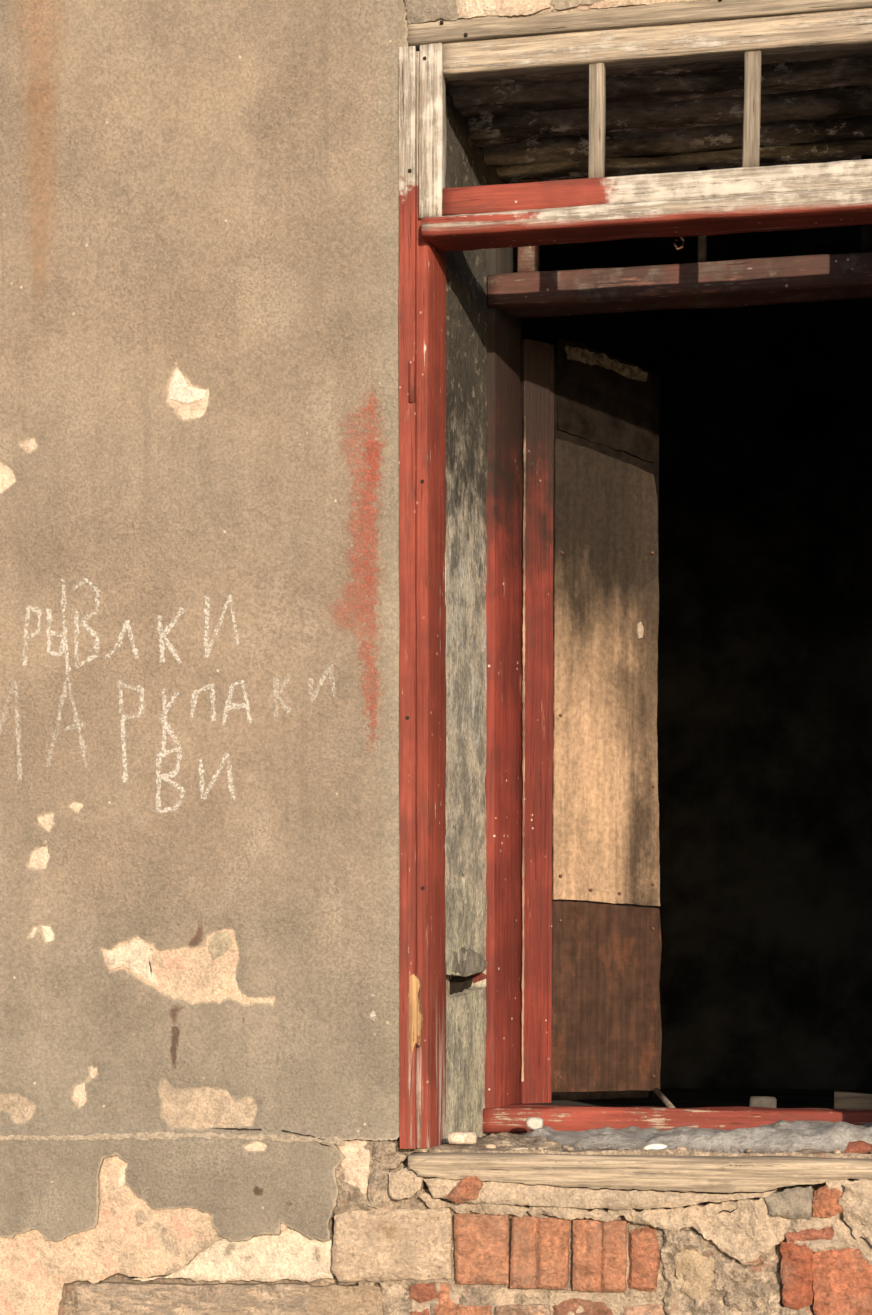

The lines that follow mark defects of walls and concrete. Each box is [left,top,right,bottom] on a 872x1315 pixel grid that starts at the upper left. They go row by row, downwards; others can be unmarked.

spalling [405,0,700,24]
flaking render [167,365,209,419]
flaking render [0,462,15,493]
peeling [102,929,275,1005]
flaking render [0,1095,35,1123]
flaking render [73,1068,97,1108]
peeling [159,1079,257,1130]
spalling [0,1139,872,1315]